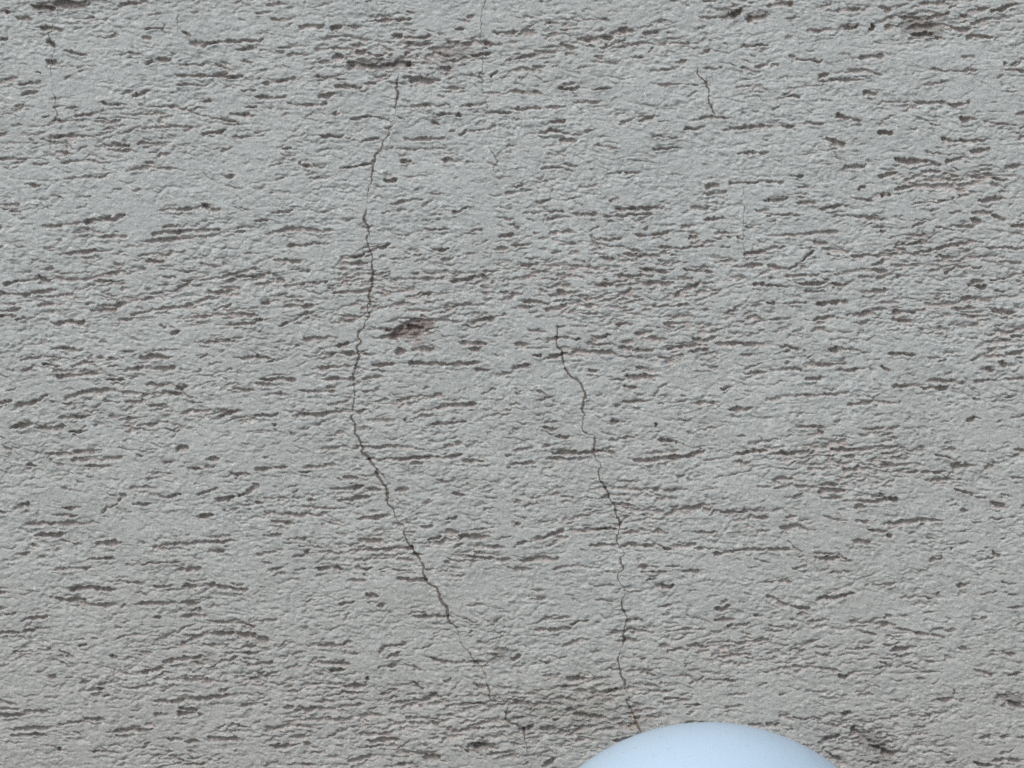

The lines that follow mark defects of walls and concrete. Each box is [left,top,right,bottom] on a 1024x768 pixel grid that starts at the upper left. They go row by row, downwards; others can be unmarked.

crack [339,74,538,758]
crack [555,323,642,733]